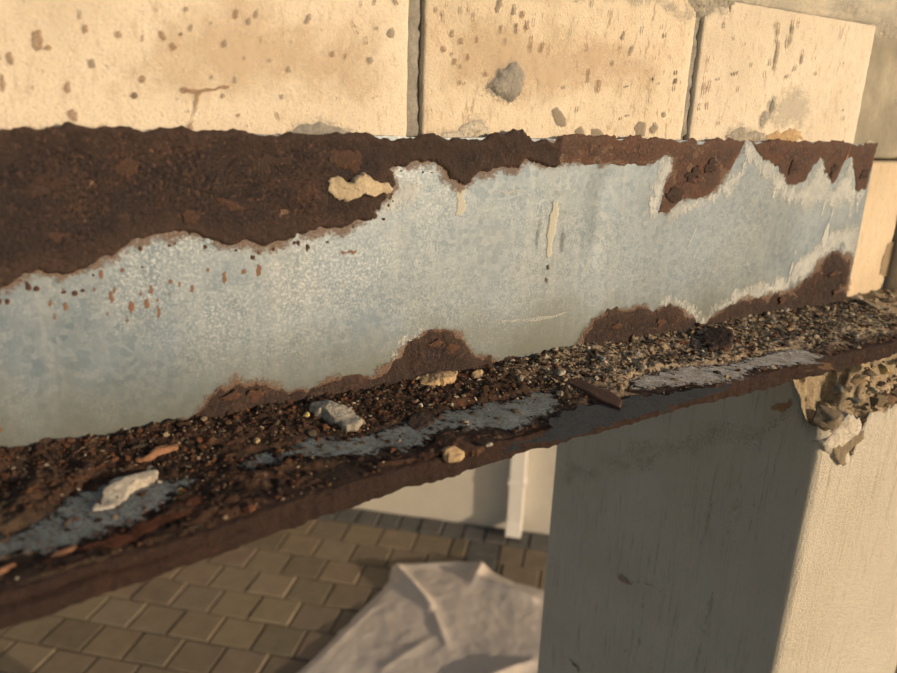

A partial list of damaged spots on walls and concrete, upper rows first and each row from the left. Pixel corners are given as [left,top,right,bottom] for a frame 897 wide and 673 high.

rust [0,121,878,322]
rust [578,250,854,346]
rust [135,444,179,463]
rust [183,328,518,420]
rust [434,431,485,458]
peeling [240,348,827,470]
rust [43,496,201,563]